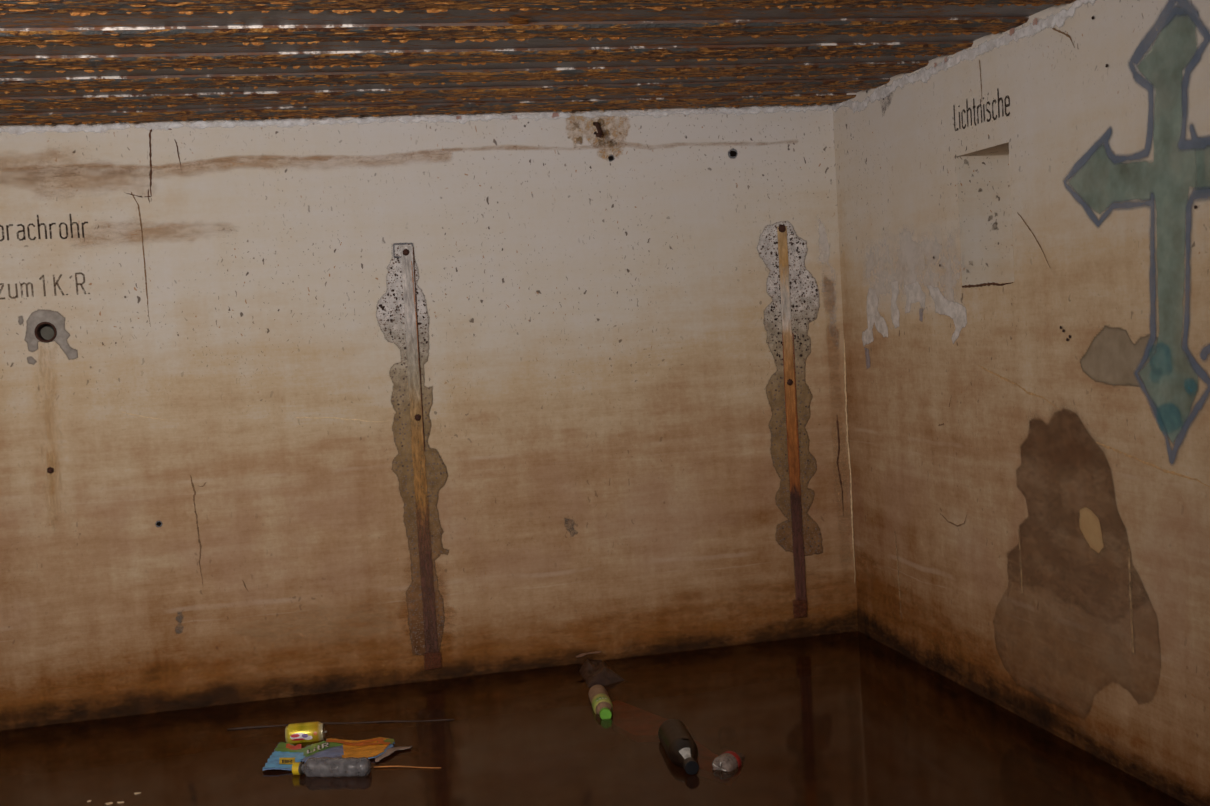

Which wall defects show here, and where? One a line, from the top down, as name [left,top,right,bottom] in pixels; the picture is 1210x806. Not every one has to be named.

corrosion [0,0,977,158]
spalling [376,244,449,655]
spalling [757,221,823,556]
peeling [862,281,967,368]
damp [1079,507,1104,554]